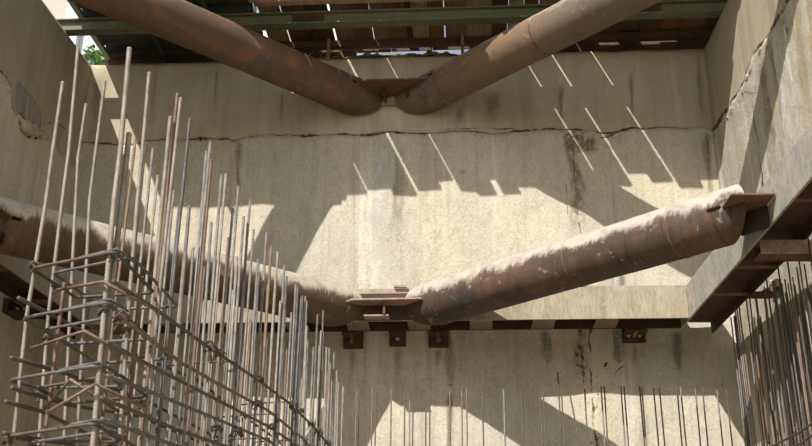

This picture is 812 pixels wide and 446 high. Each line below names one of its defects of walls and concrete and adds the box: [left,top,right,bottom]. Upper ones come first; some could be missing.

spalling [15,80,46,140]
crack [87,0,795,233]
crack [584,329,624,446]